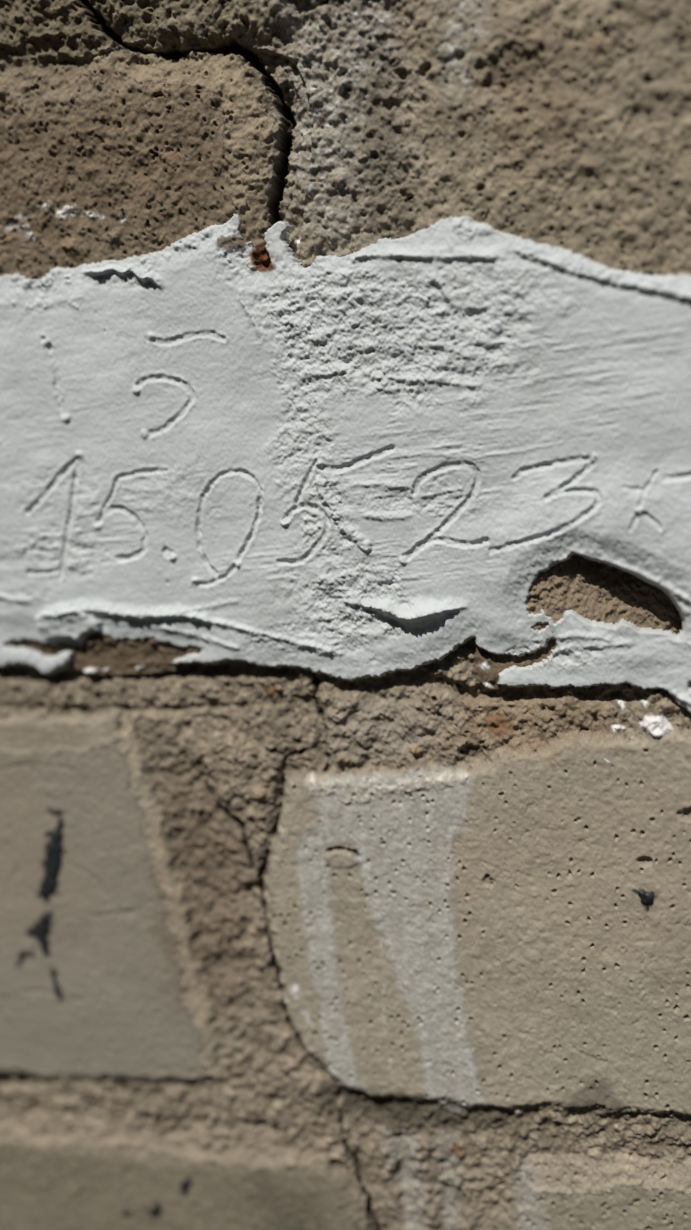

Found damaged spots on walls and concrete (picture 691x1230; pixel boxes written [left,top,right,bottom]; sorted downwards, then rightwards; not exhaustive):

crack [74,0,297,230]
spalling [7,608,201,675]
spalling [471,555,683,690]
crack [199,671,383,1230]